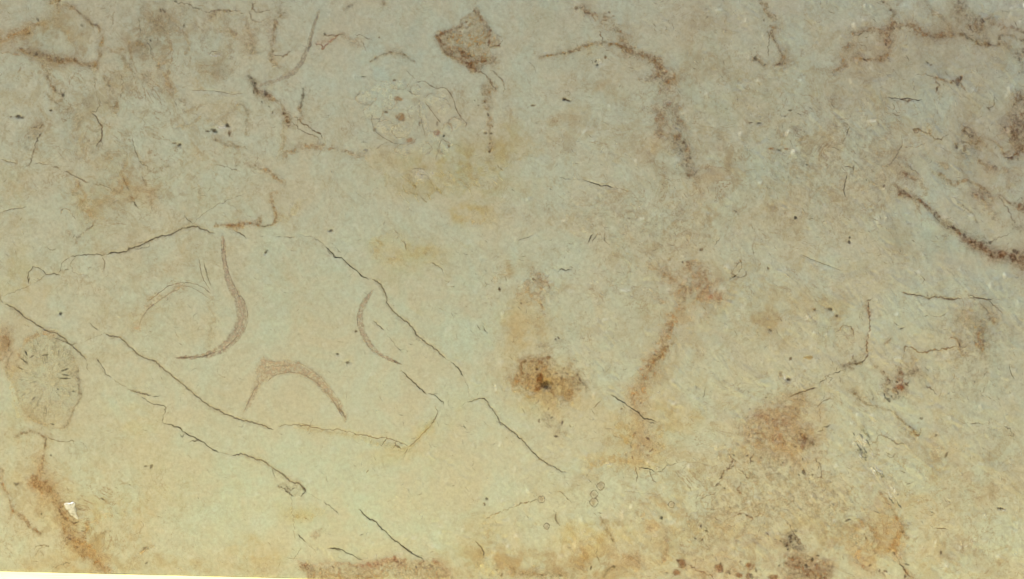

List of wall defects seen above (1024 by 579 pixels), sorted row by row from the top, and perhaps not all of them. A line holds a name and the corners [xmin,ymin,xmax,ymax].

crack [27,218,210,281]
crack [7,304,109,376]
crack [327,248,462,375]
crack [94,327,444,453]
crack [131,390,305,490]
crack [470,398,562,472]
crack [330,506,422,558]